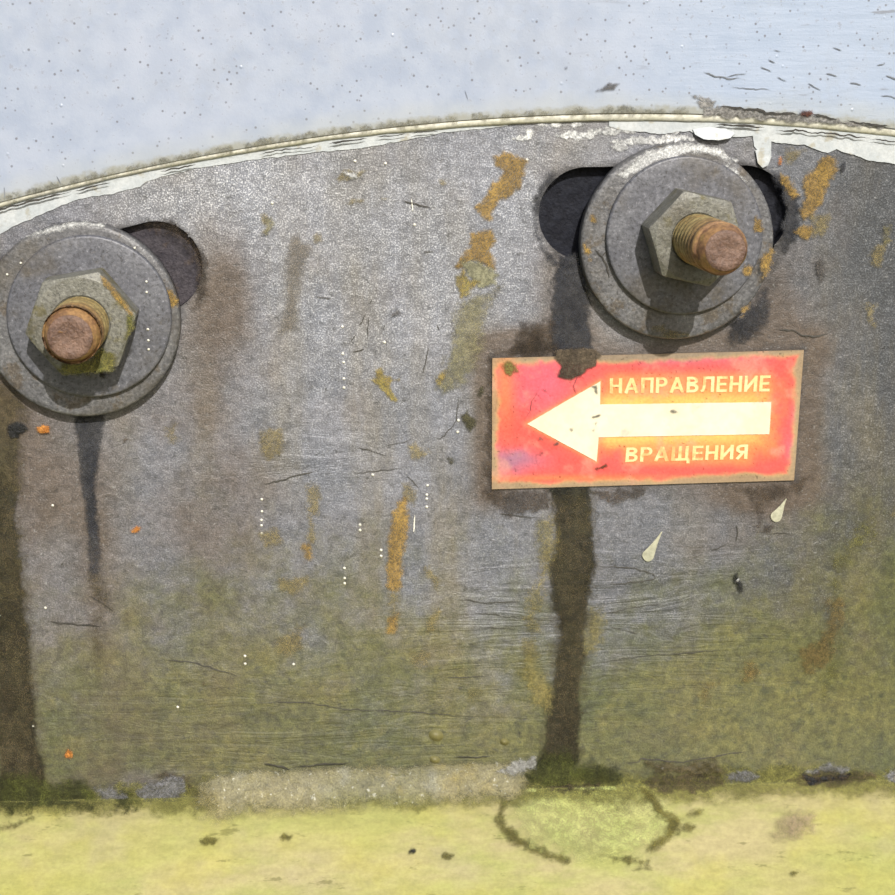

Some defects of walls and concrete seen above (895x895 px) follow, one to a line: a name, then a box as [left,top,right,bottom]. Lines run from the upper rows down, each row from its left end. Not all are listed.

peeling [0,124,509,234]
corrosion [475,152,526,220]
peeling [512,95,895,168]
corrosion [779,156,838,239]
corrosion [439,231,498,391]
damp [515,254,593,356]
damp [0,385,45,787]
damp [75,415,104,575]
corrosion [387,497,408,590]
damp [541,487,596,765]
damp [495,785,701,864]